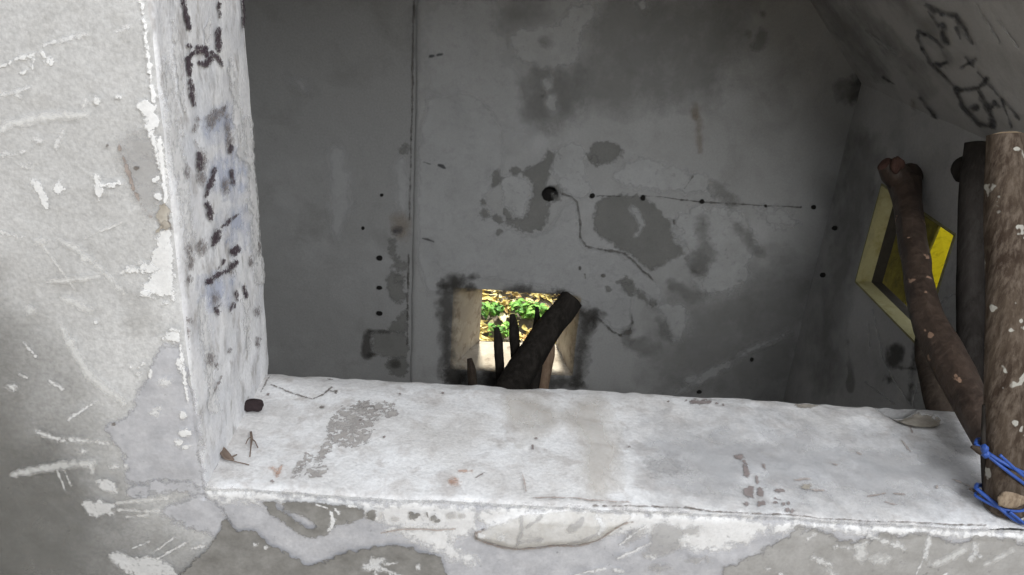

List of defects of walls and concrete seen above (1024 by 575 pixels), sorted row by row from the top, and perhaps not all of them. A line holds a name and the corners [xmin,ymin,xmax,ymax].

peeling [125,0,207,305]
peeling [227,58,265,351]
flaking render [481,141,684,271]
crack [562,193,652,279]
peeling [162,294,222,450]
peeling [292,400,398,478]
peeling [181,454,1024,575]